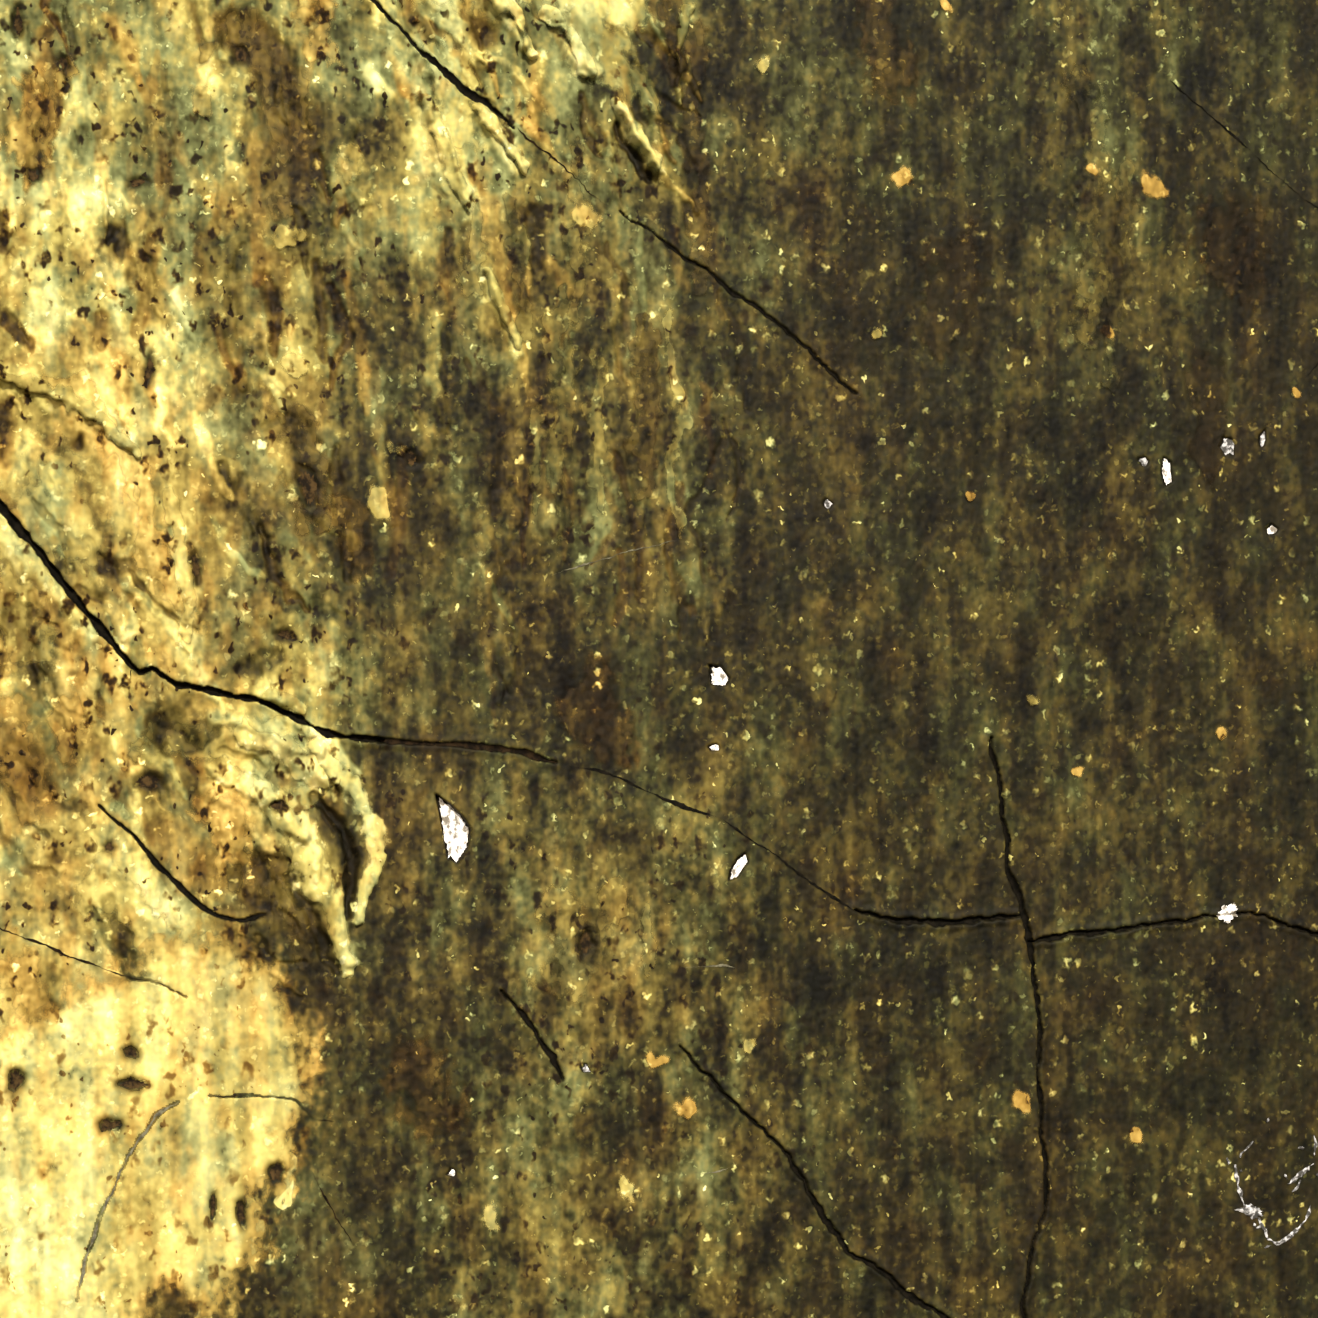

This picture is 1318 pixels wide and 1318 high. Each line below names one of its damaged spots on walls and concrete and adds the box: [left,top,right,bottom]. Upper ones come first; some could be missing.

crack [371,0,857,394]
damp [656,0,712,296]
damp [920,217,992,362]
damp [1063,63,1144,393]
damp [1184,348,1231,490]
peeling [439,798,469,862]
crack [0,501,1318,1318]